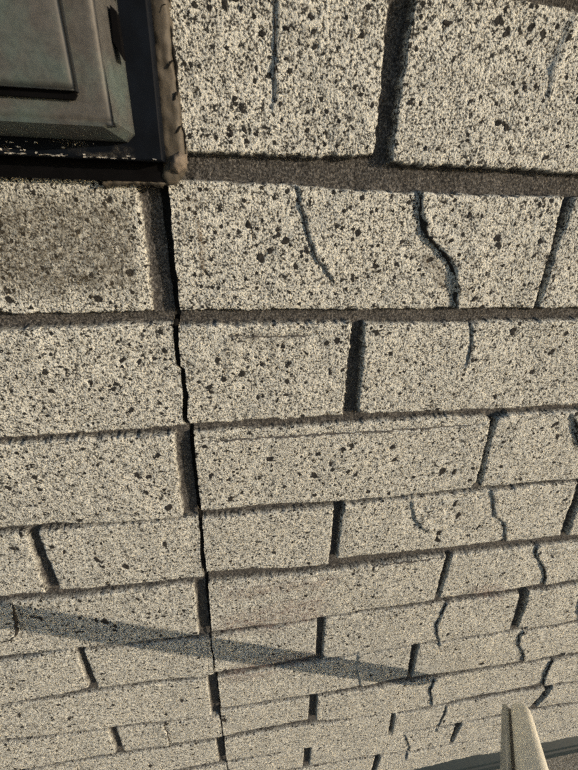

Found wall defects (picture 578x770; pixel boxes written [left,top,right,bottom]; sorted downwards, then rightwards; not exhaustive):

crack [160,185,486,769]
crack [491,493,506,541]
crack [534,546,550,585]